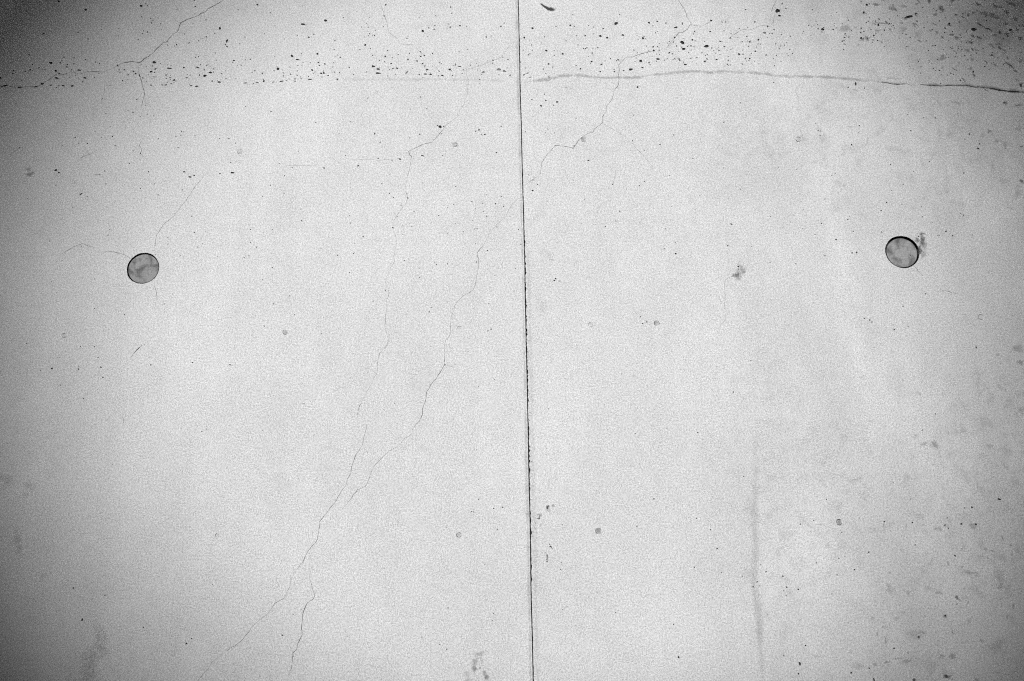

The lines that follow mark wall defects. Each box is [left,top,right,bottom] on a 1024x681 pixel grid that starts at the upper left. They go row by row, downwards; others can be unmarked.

crack [10,0,224,107]
crack [884,82,1023,92]
crack [199,3,709,679]